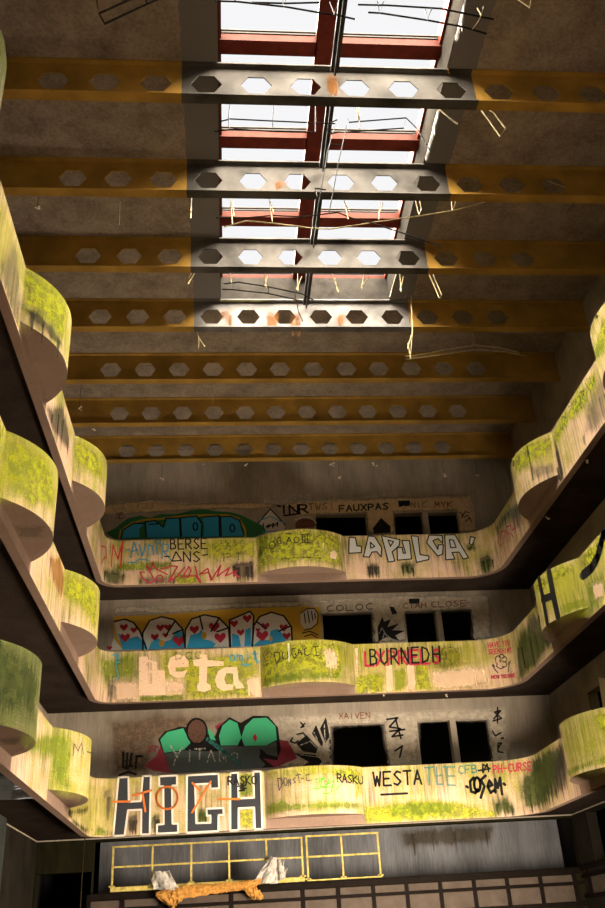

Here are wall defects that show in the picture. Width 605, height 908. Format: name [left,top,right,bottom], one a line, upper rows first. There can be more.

water stain [496,745,568,815]